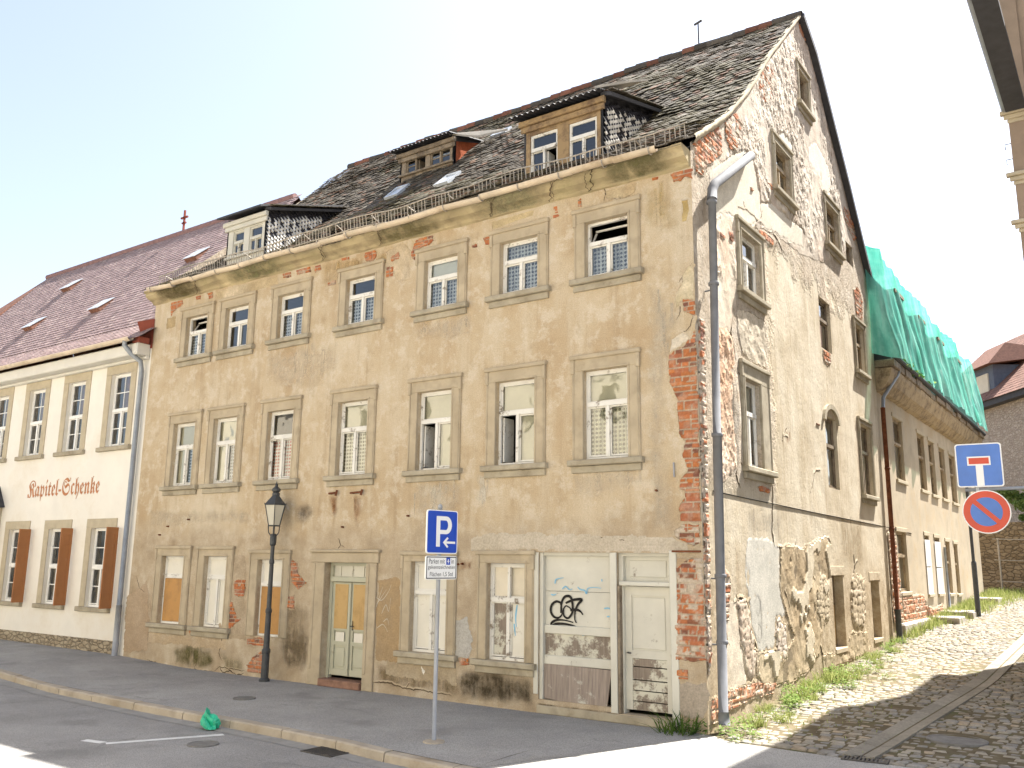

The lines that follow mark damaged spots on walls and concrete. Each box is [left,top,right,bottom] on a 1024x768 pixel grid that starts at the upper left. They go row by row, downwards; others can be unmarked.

spalling [652,22,857,263]
flaking render [363,235,436,279]
flaking render [666,200,767,681]
flaking render [228,578,248,629]
flaking render [287,559,309,611]
flaking render [246,636,264,676]
spalling [709,536,871,727]
leakage [445,674,552,706]